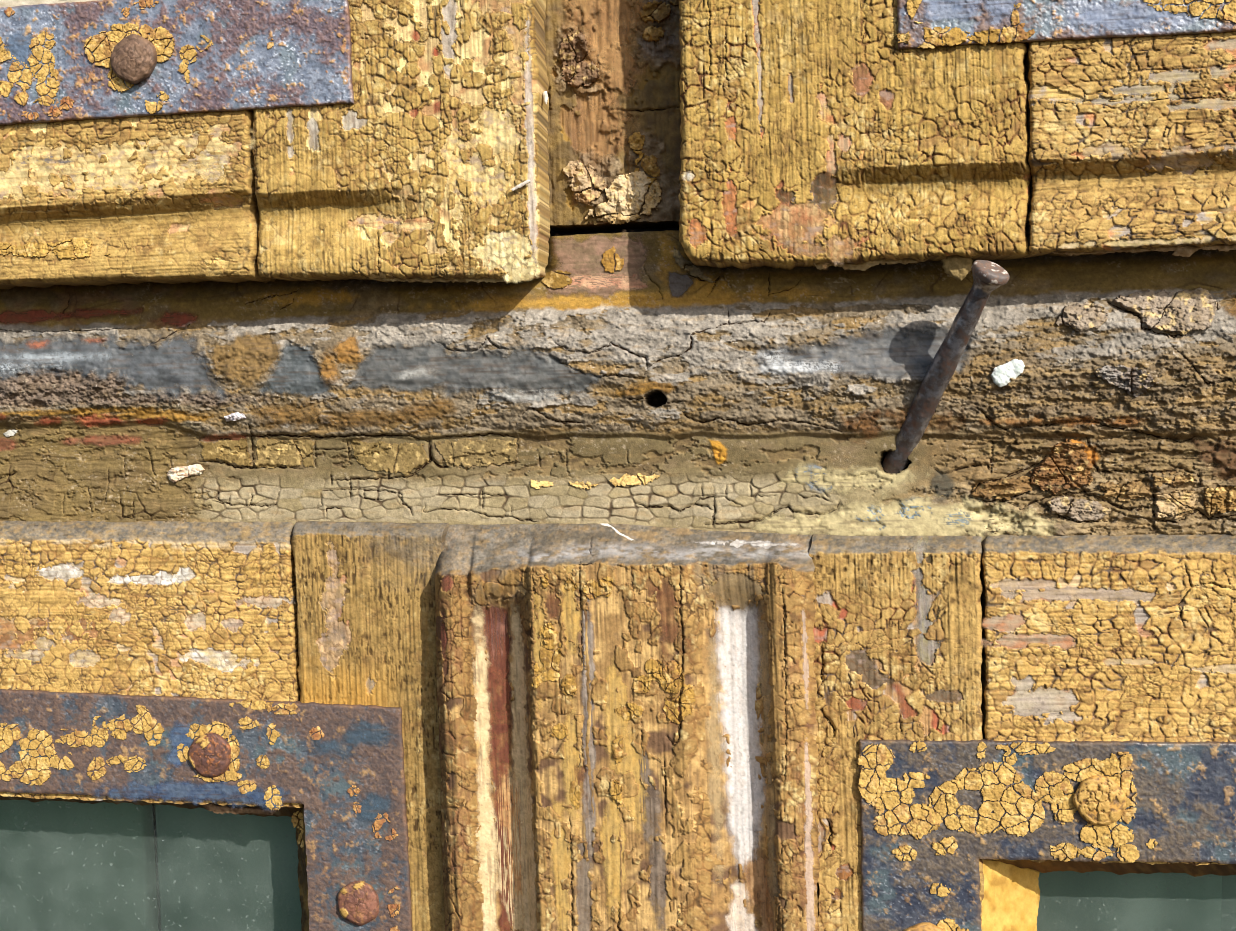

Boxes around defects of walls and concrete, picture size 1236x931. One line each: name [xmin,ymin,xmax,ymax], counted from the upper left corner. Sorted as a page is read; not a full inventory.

crack [707,0,729,87]
peeling [354,0,679,298]
peeling [1055,287,1222,334]
peeling [991,359,1025,387]
peeling [167,438,315,482]
crack [199,408,583,522]
crack [636,483,840,525]
peeling [754,438,1236,541]
peeling [472,566,613,931]
peeling [599,658,696,914]
peeling [716,606,765,866]
peeling [726,883,755,931]